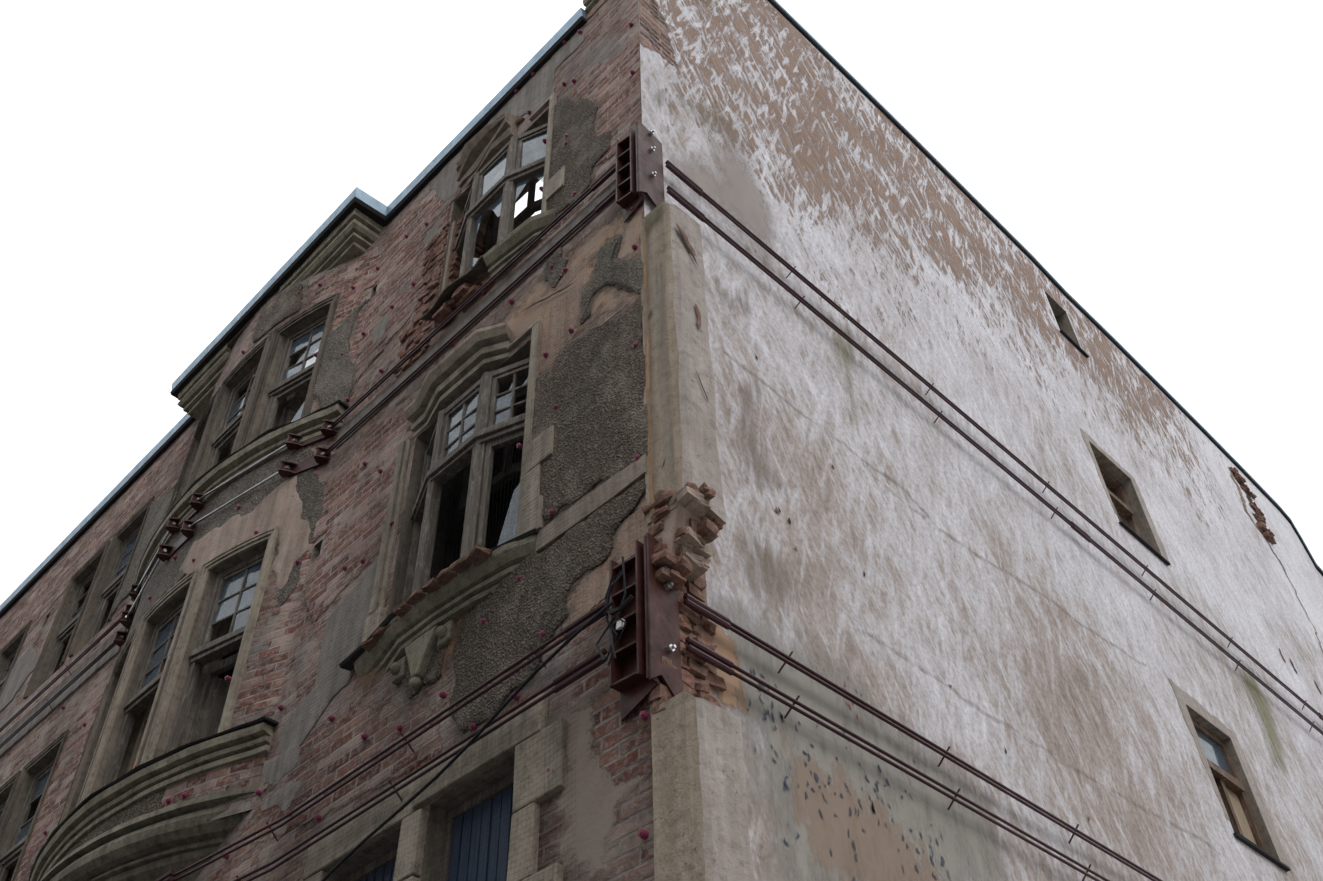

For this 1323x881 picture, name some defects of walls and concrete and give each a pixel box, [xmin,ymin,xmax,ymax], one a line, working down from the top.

peeling [573,0,1277,544]
flaking render [179,397,426,627]
peeling [555,482,1004,881]
crack [1266,539,1323,651]